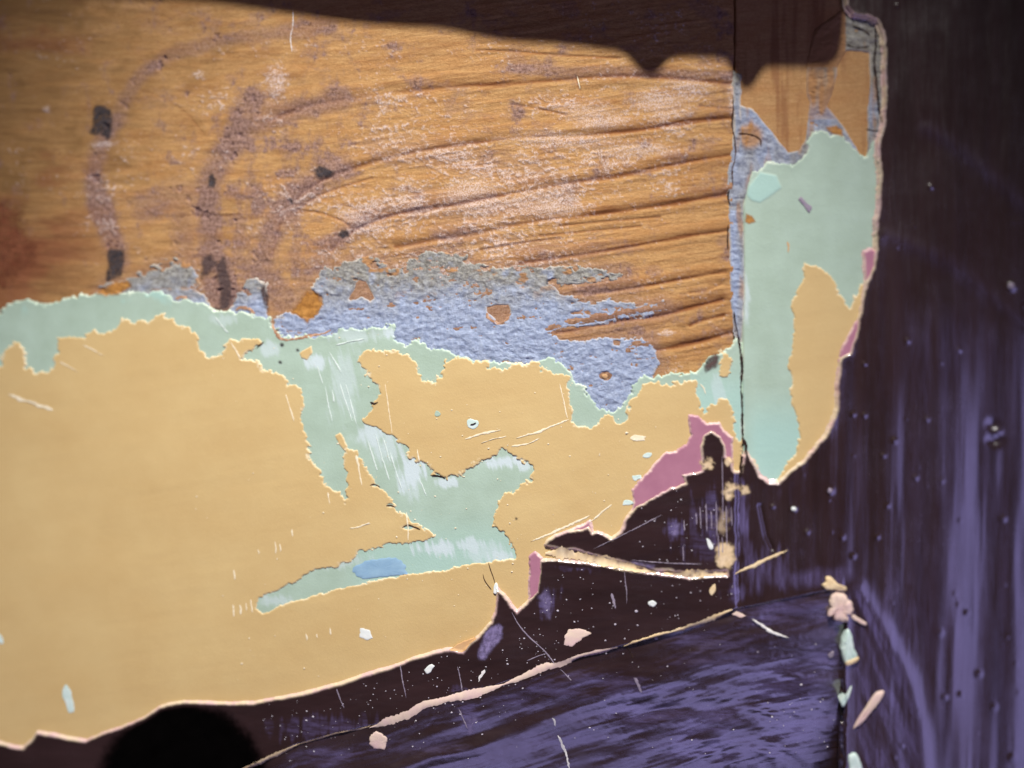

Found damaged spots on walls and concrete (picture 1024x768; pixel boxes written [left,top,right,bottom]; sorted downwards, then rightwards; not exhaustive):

peeling [0,250,745,745]
peeling [0,0,881,613]
crack [733,313,750,486]
crack [727,100,762,249]